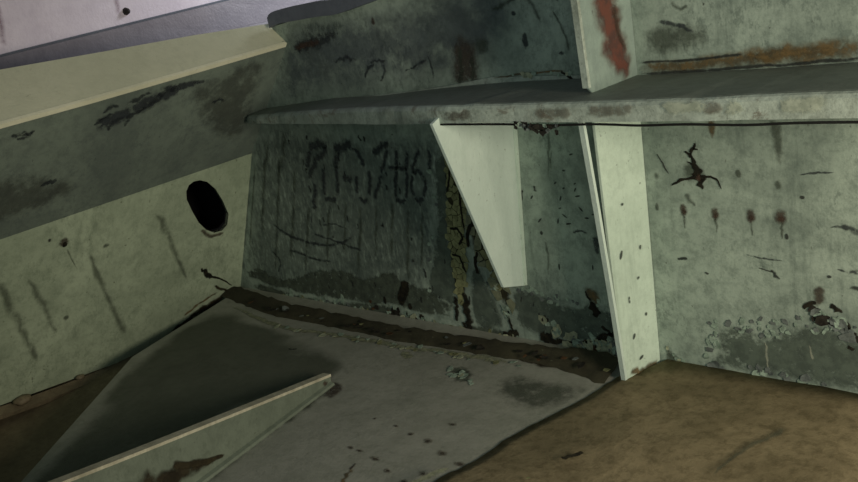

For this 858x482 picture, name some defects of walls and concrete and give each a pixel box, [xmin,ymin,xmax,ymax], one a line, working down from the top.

corrosion [595,0,630,76]
corrosion [644,41,858,75]
crack [657,143,721,189]
peeling [249,151,615,340]
corrosion [775,212,786,238]
peeling [703,287,858,388]